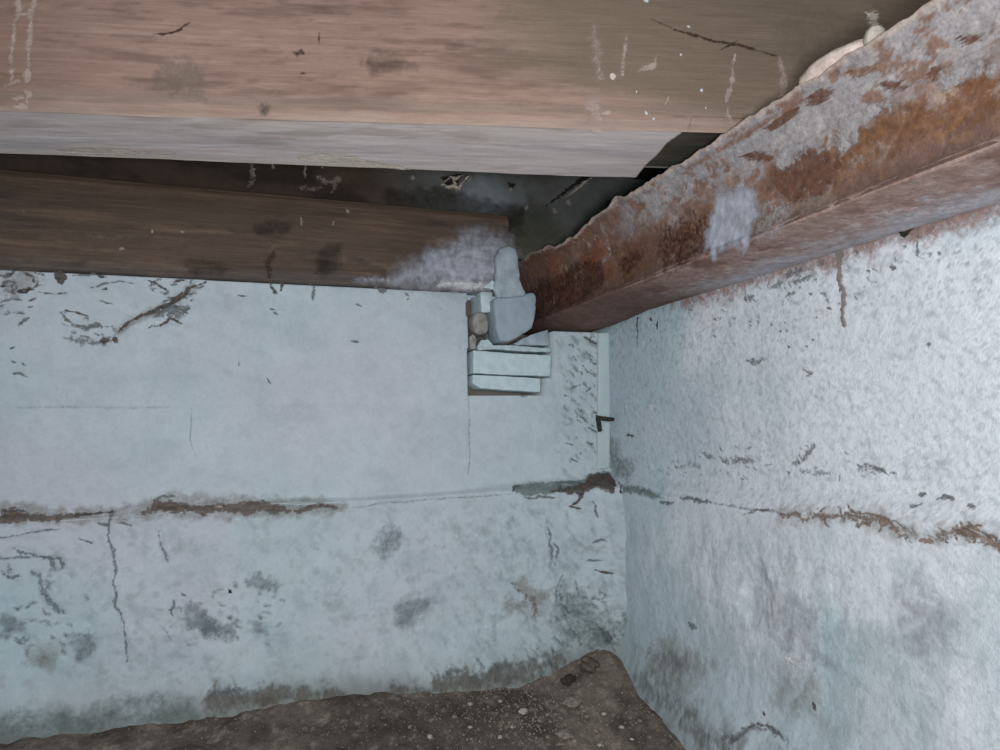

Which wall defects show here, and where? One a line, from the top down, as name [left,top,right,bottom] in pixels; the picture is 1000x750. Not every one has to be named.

rust [956,35,981,47]
rust [739,58,1000,202]
crack [99,278,206,344]
rust [532,211,709,319]
rust [682,205,1000,308]
crack [659,496,1000,553]
crack [0,495,345,661]
leakage [187,606,238,636]